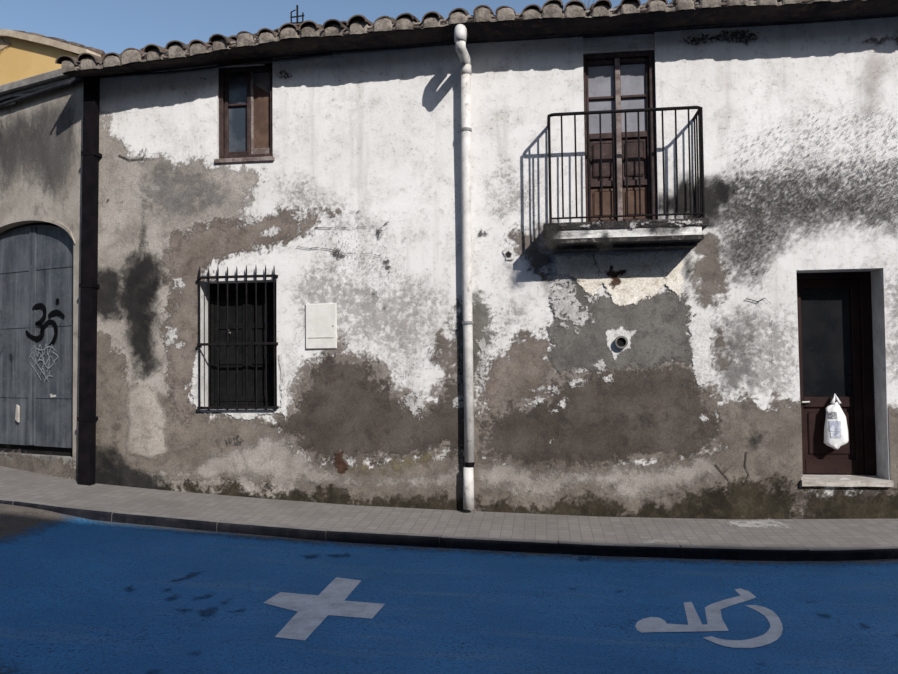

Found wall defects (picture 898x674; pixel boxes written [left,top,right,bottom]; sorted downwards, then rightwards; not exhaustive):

leakage [0,105,75,194]
peeling [239,215,281,238]
leakage [648,105,898,288]
leakage [97,229,162,379]
peeling [163,327,185,352]
peeling [190,347,287,421]
peeling [299,249,434,353]
leakage [95,290,724,502]
rust [605,266,628,288]
peeling [549,250,684,339]
peeling [605,326,637,360]
peeling [688,311,797,393]